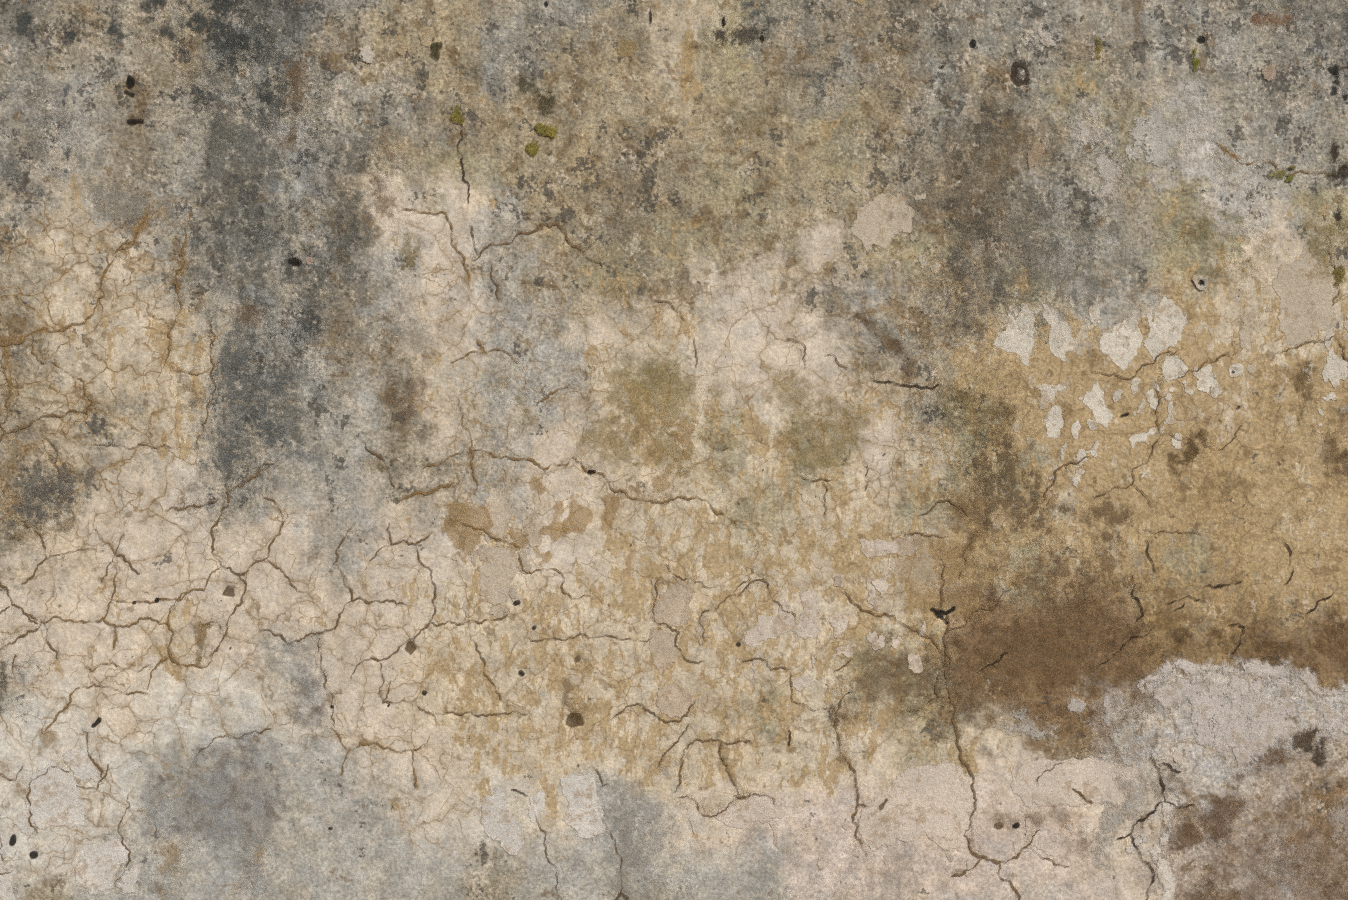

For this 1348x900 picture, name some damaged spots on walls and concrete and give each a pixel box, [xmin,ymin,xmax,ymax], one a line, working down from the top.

damp [142,0,262,65]
crack [401,100,603,300]
damp [1069,78,1255,198]
damp [1328,64,1348,104]
crack [0,202,217,479]
peeling [993,294,1244,491]
peeling [1302,332,1348,426]
damp [973,402,1132,609]
crack [0,394,797,900]
crack [843,499,1069,900]
damp [1137,610,1348,777]
crack [1118,753,1194,900]